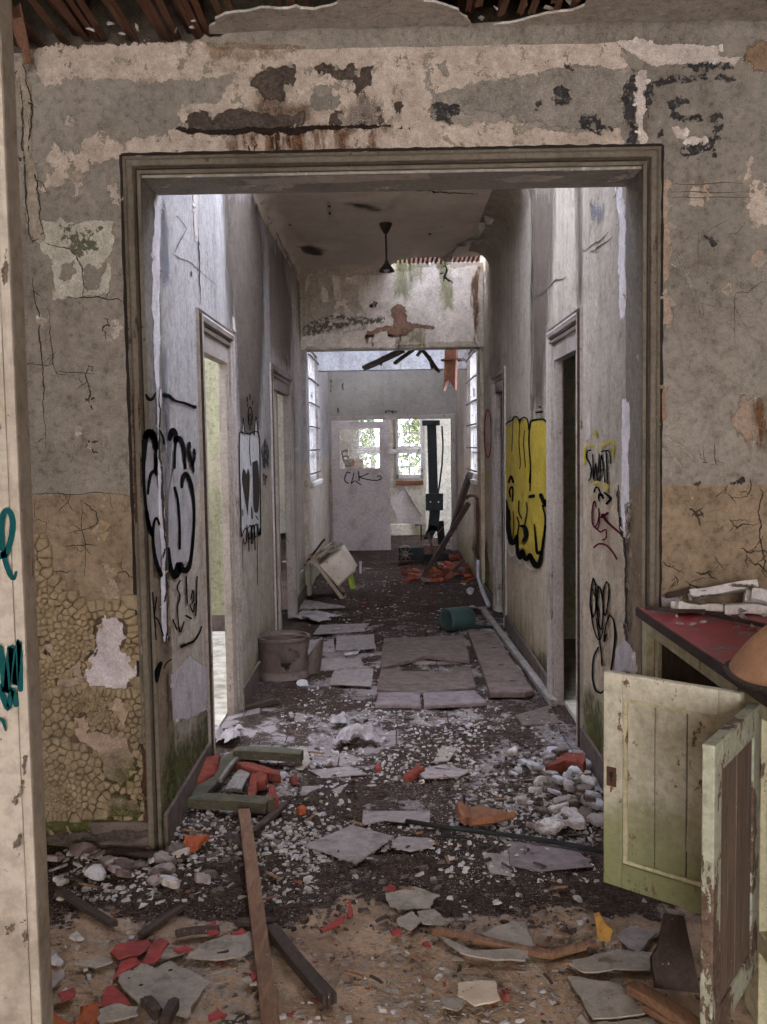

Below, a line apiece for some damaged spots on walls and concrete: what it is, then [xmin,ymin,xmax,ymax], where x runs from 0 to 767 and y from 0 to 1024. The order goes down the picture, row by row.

peeling [30,37,743,197]
peeling [291,216,494,595]
crack [27,143,767,840]
peeling [34,533,156,847]